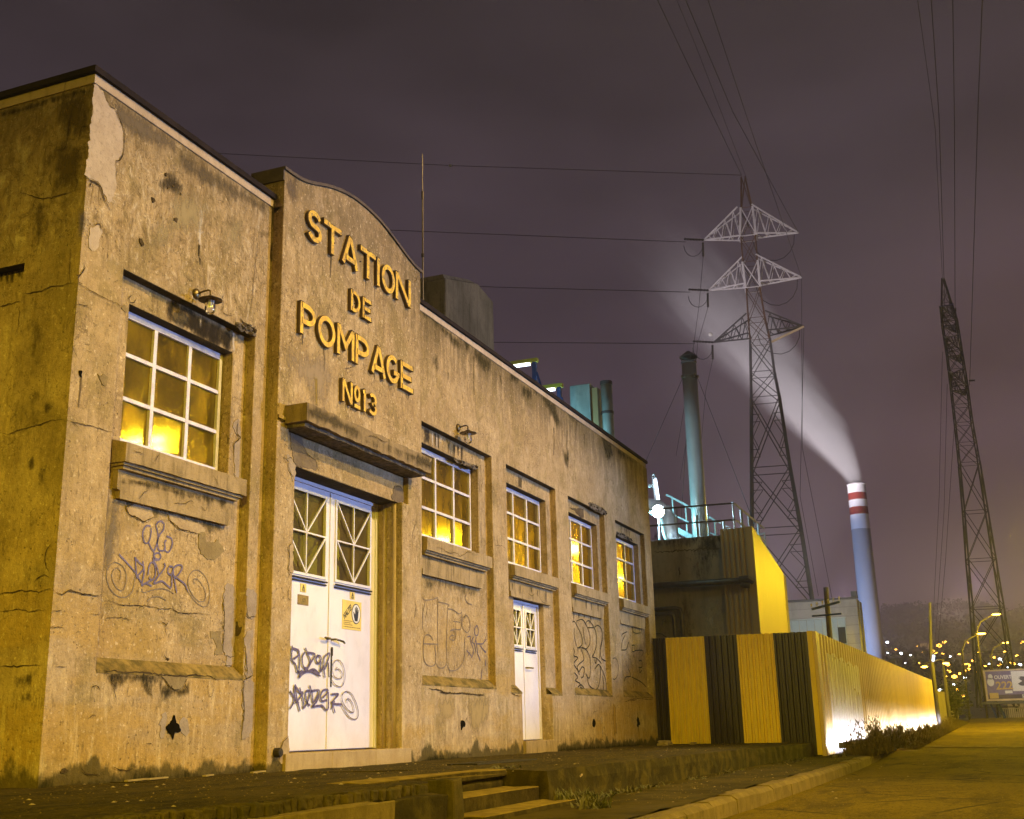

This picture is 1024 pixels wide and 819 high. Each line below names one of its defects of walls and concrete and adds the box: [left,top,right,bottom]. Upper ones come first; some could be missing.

peeling [84,84,125,203]
leakage [117,106,265,210]
spalling [88,223,103,251]
peeling [125,503,154,522]
peeling [168,514,224,560]
crack [1,544,234,718]
peeling [210,583,257,740]
leakage [109,674,189,697]
peeling [158,711,189,739]